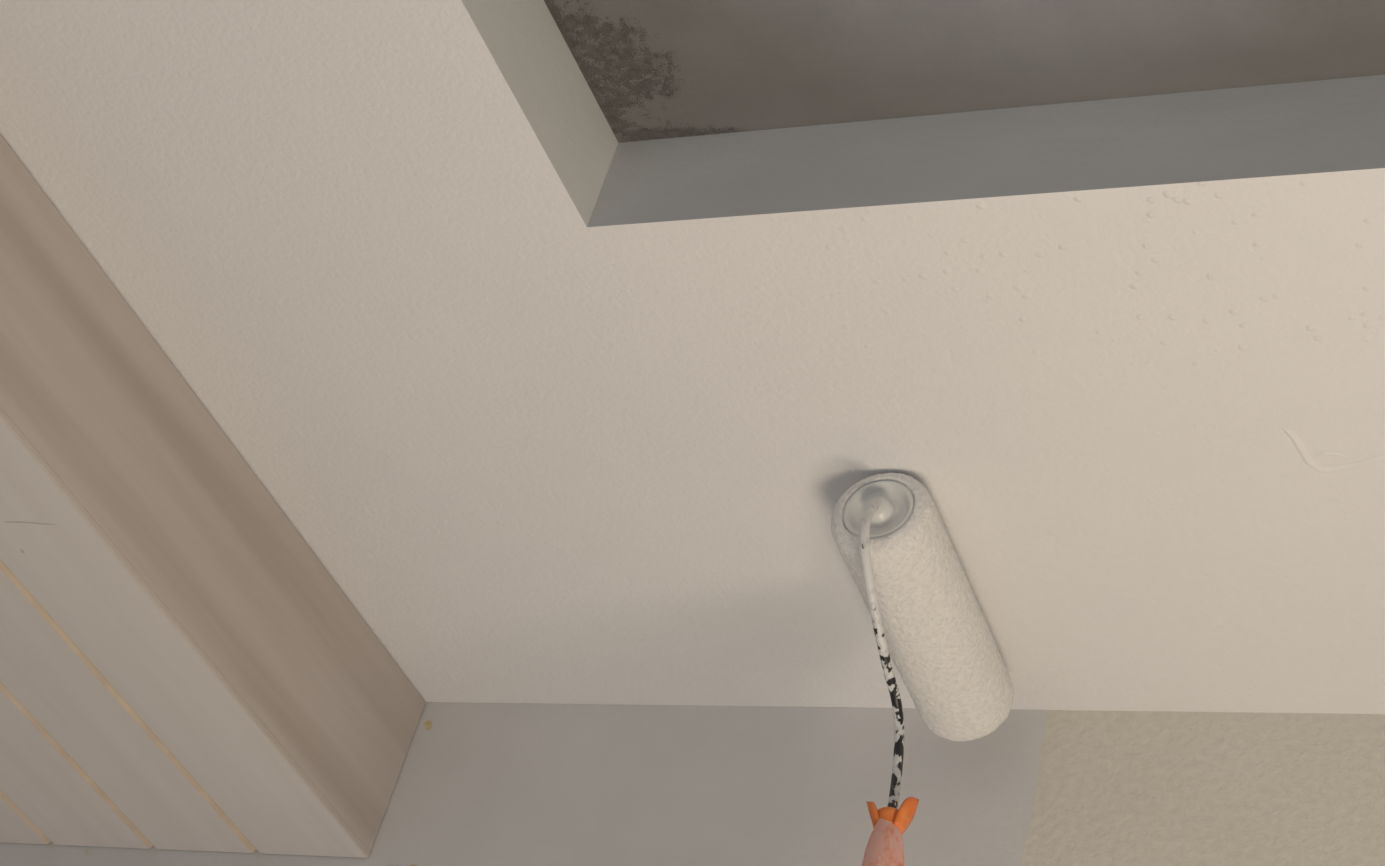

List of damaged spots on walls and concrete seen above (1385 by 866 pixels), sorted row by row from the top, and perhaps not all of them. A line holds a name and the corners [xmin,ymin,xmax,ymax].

damp [544,0,748,142]